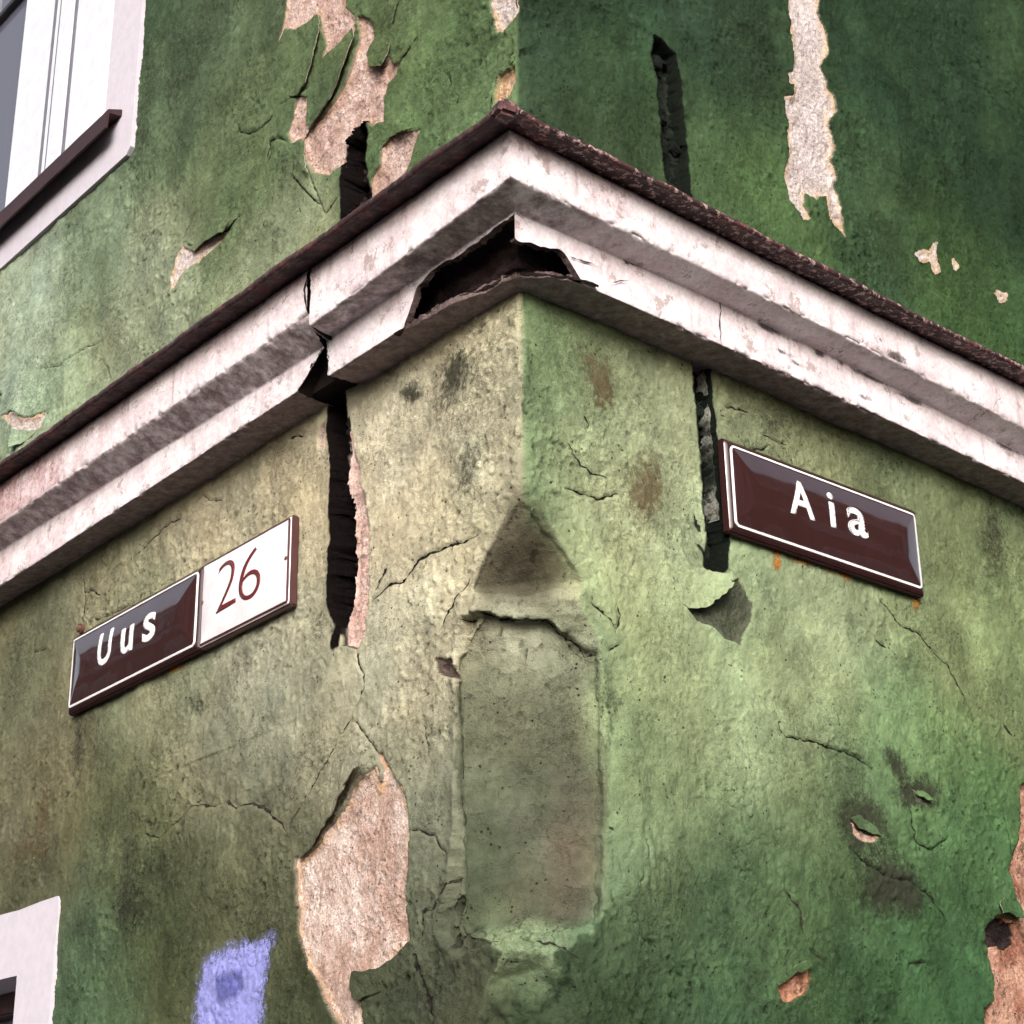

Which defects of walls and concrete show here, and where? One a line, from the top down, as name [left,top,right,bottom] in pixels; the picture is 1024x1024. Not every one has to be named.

peeling [170,216,240,291]
peeling [267,0,420,214]
crack [358,170,372,207]
spalling [409,219,599,323]
crack [651,53,681,188]
peeling [784,0,843,234]
peeling [915,242,959,274]
crack [694,369,746,568]
crack [133,431,476,844]
crack [776,714,870,767]
spalling [294,745,416,1024]
spalling [984,784,1024,1024]